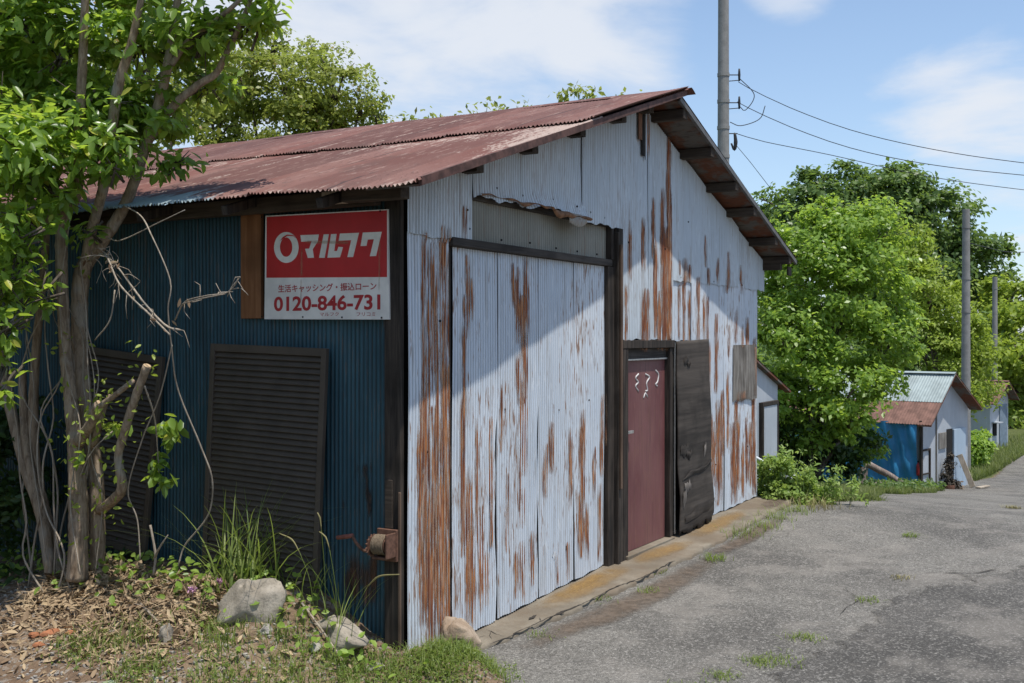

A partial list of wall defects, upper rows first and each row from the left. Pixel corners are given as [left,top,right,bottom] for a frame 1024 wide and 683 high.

rust [416,229,503,642]
rust [506,257,534,598]
rust [543,423,554,497]
rust [557,399,610,597]
rust [625,138,757,531]